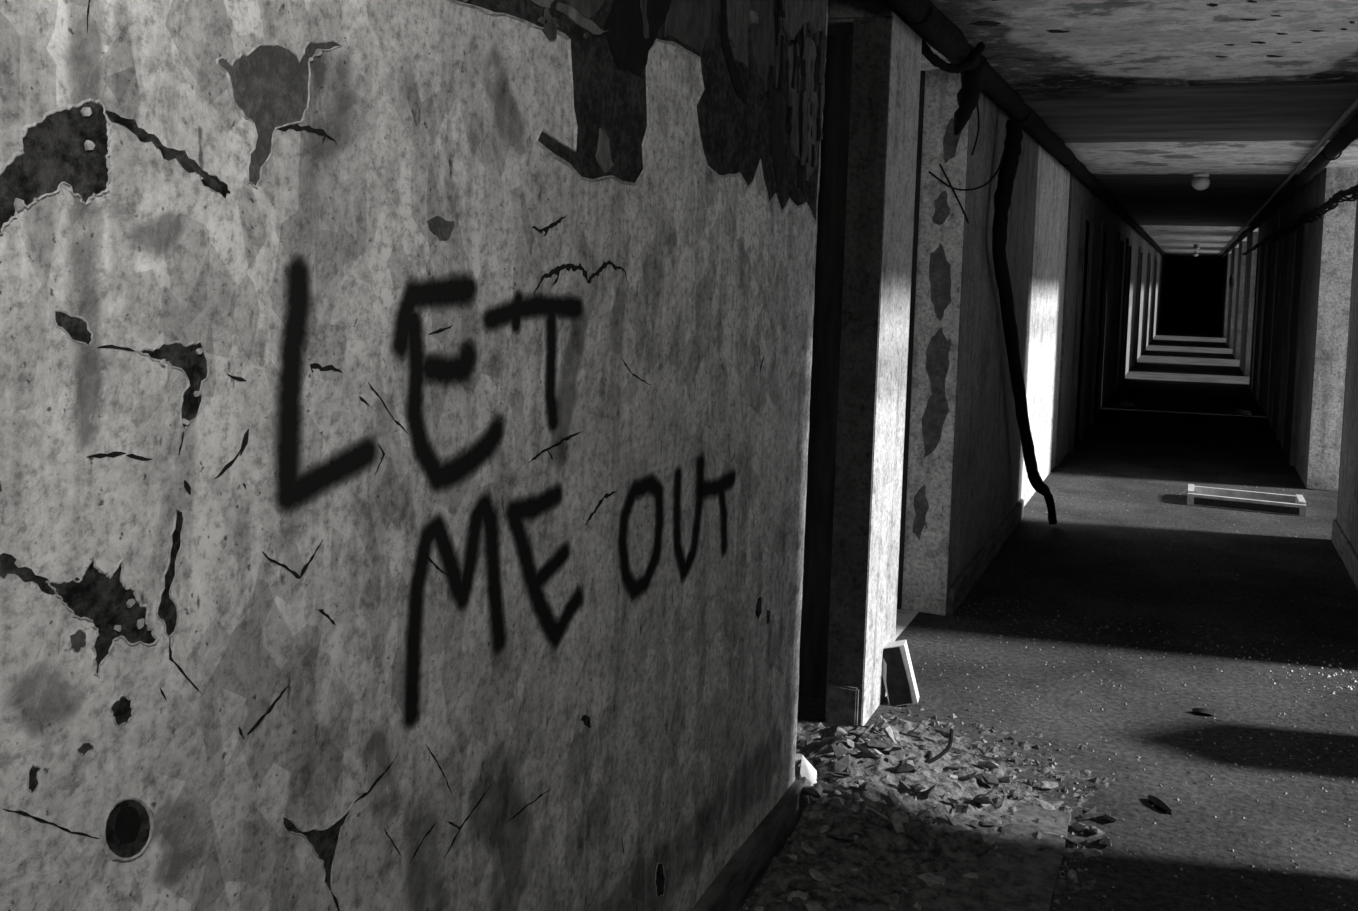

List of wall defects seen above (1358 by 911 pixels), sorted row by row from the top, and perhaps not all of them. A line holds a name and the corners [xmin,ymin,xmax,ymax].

peeling [446,0,828,225]
peeling [942,116,962,164]
spalling [426,215,454,242]
crack [97,344,135,352]
peeling [921,189,953,461]
peeling [912,484,930,541]
crack [331,891,340,911]